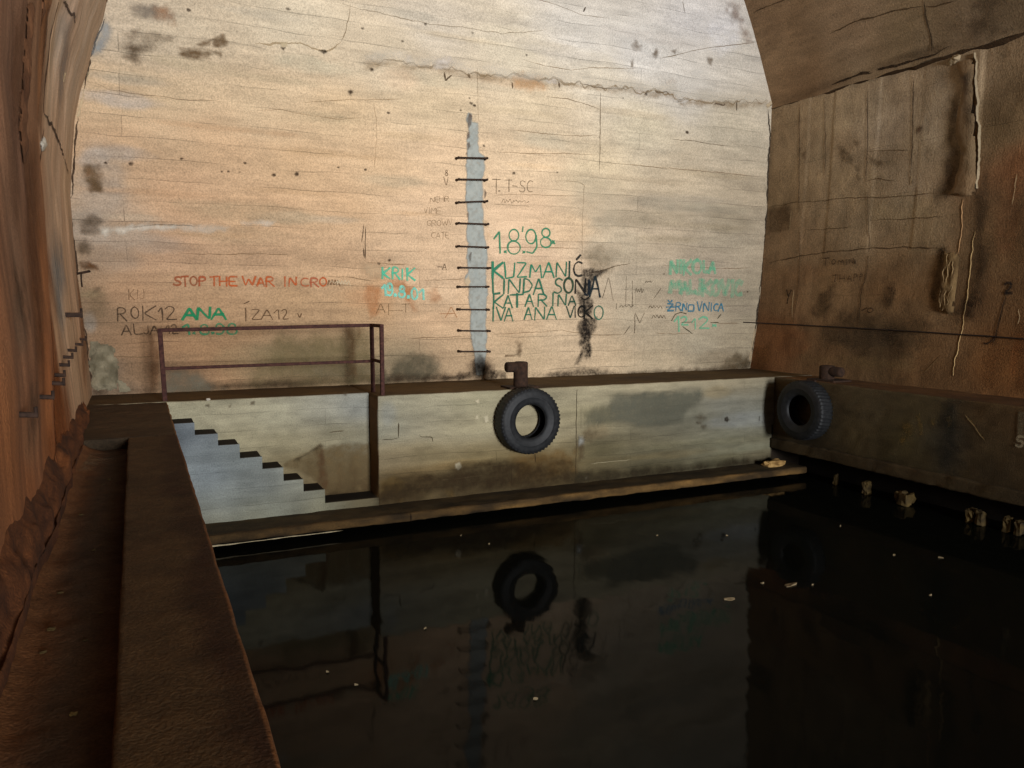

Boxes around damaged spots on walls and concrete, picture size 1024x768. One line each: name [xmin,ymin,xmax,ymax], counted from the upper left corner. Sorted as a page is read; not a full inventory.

crack [40,1,105,272]
crack [370,58,772,365]
leakage [578,270,604,359]
crack [832,1,953,85]